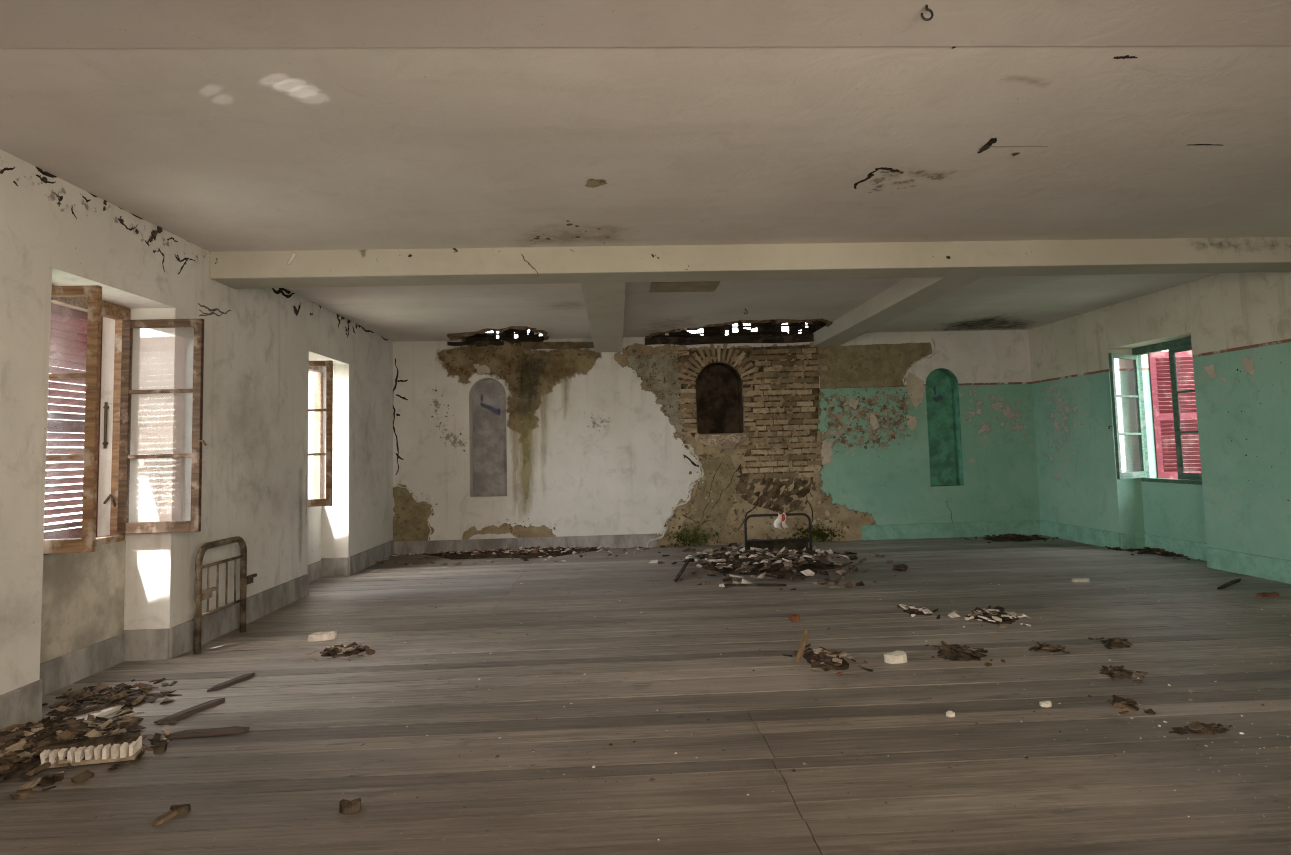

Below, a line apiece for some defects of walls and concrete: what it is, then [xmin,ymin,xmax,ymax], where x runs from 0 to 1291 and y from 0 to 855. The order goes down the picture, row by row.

peeling [854,167,950,193]
crack [0,166,195,274]
crack [198,303,231,316]
flaking render [521,341,594,350]
crack [272,288,408,475]
peeling [430,390,467,452]
flaking render [614,338,935,547]
flaking render [393,484,437,542]